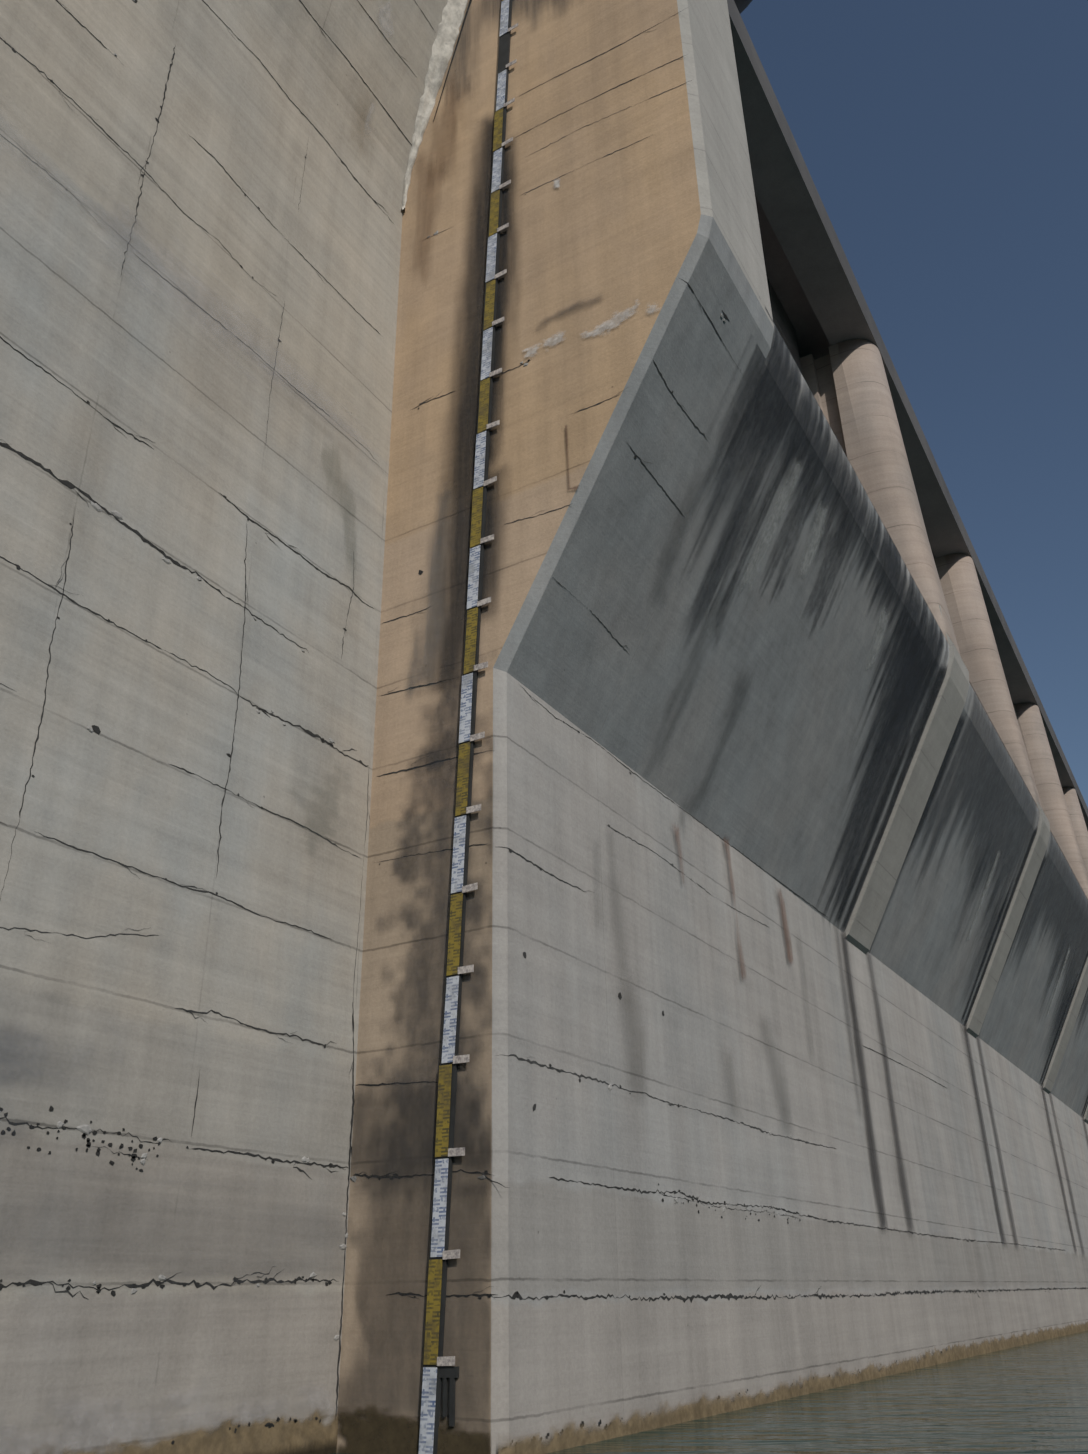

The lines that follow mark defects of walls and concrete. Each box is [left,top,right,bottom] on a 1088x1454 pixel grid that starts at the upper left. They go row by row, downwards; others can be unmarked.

crack [0,0,447,460]
damp [440,121,512,736]
crack [628,444,683,515]
crack [653,360,708,441]
crack [522,687,827,927]
damp [699,336,947,1226]
crack [0,439,592,1418]
crack [496,1054,836,1149]
crack [550,1177,1063,1251]
crack [388,1286,1088,1303]
damp [64,1407,419,1454]
damp [437,1322,1088,1454]